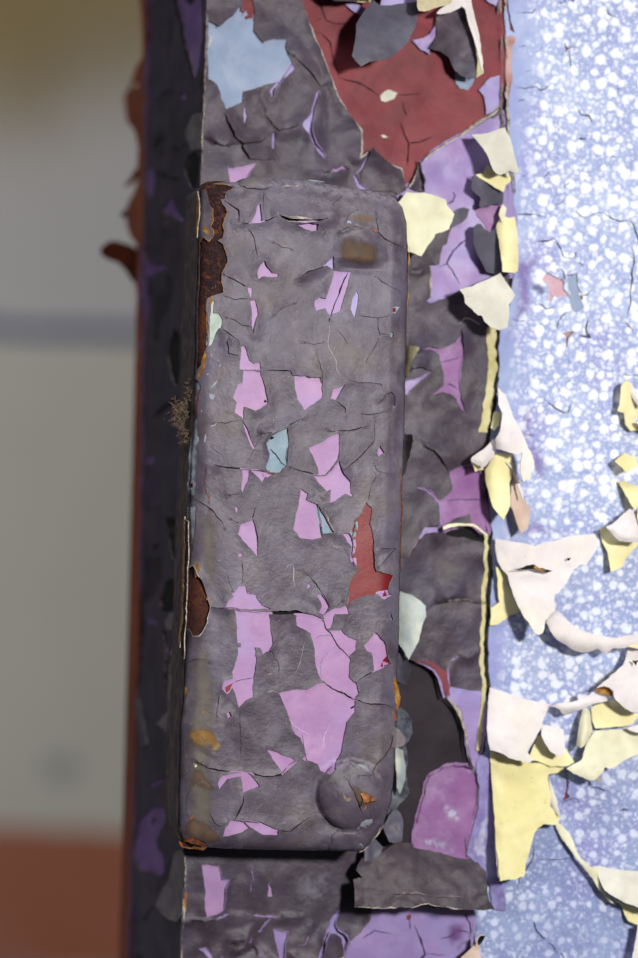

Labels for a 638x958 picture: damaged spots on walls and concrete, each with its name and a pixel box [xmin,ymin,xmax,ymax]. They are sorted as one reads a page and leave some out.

peeling [178,0,296,123]
crack [497,0,565,137]
peeling [227,163,257,182]
peeling [302,0,519,411]
crack [507,170,570,216]
crack [539,238,591,338]
crack [583,212,638,327]
crack [478,276,523,500]
crack [441,526,493,754]
peeling [318,380,638,958]
peeling [135,807,186,922]
peeling [202,864,230,918]